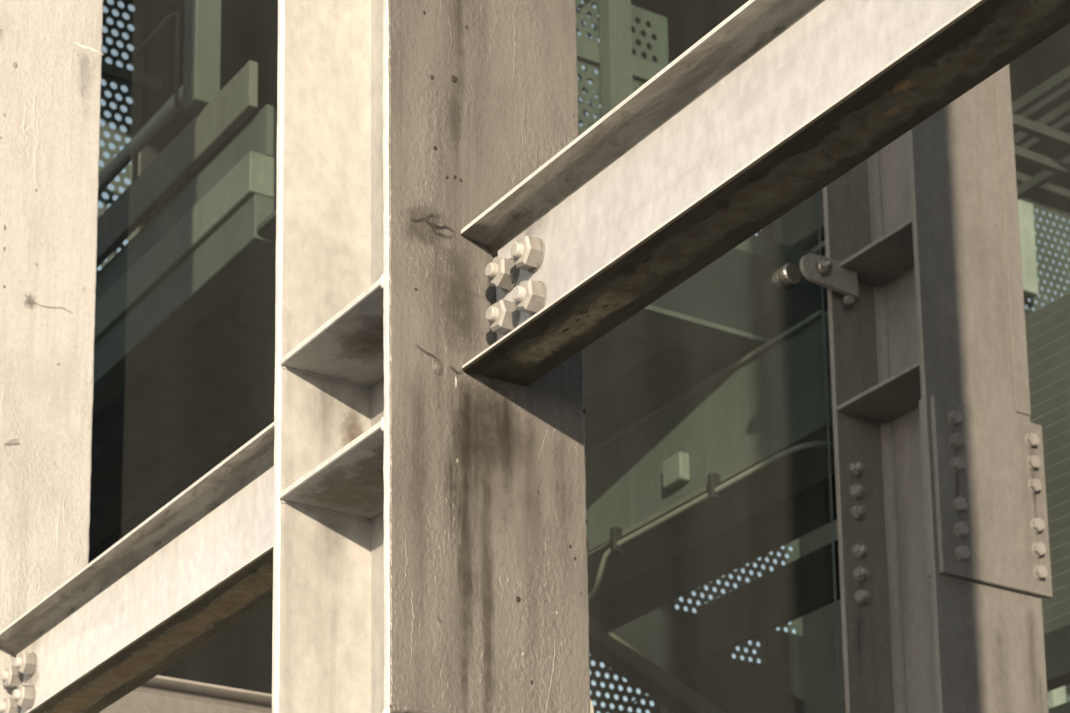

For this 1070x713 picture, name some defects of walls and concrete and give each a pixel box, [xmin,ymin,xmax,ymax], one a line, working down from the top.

crack [410,213,457,237]
corrosion [509,189,773,365]
corrosion [51,566,273,713]